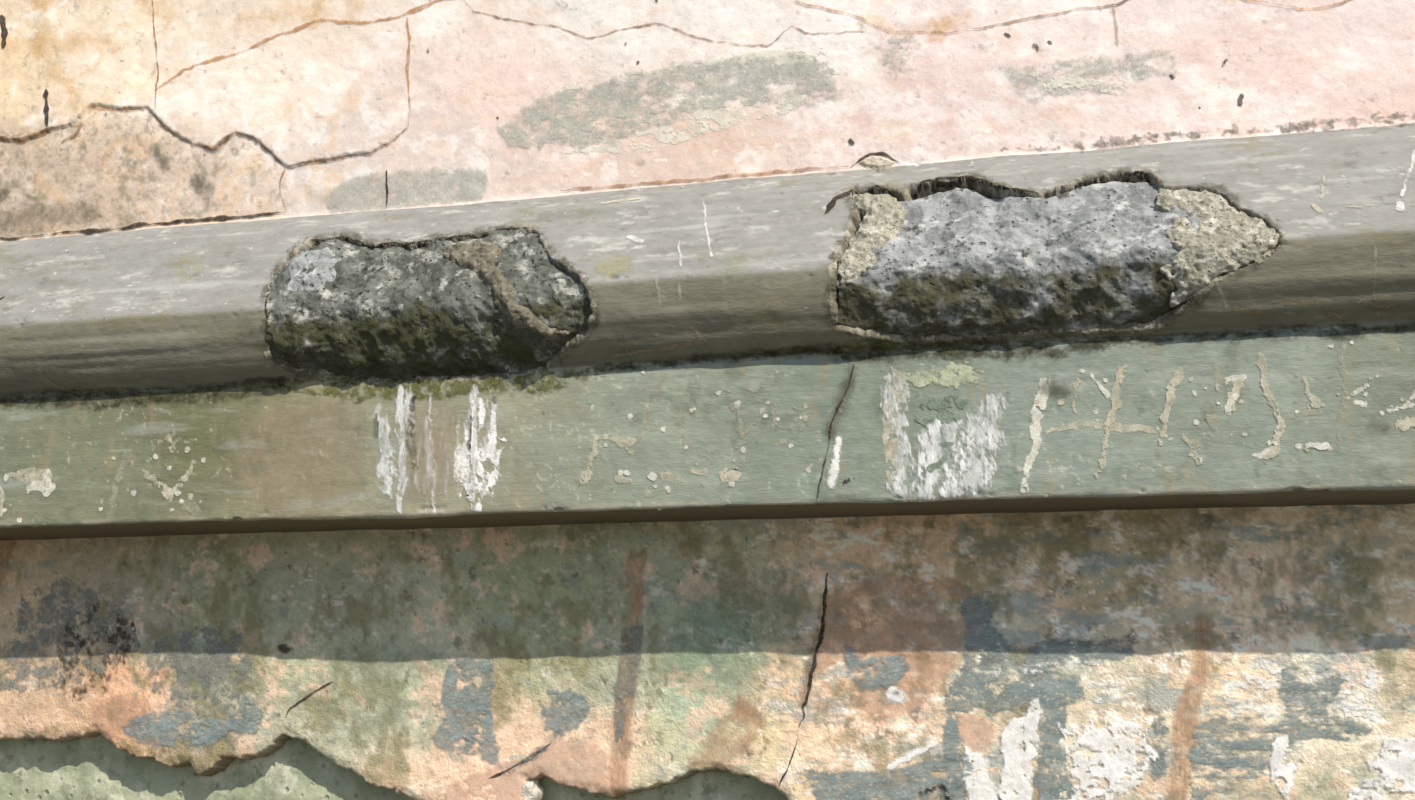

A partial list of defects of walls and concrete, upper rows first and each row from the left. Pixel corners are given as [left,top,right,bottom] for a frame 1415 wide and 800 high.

crack [474,0,1126,47]
crack [0,0,441,240]
flaking render [326,169,487,213]
crack [568,166,846,190]
crack [1054,119,1334,150]
spalling [263,223,599,384]
spalling [824,139,1286,502]
damp [375,385,506,514]
crack [817,364,854,498]
flaking render [0,578,415,800]
flaking render [434,626,788,800]
crack [778,573,828,788]